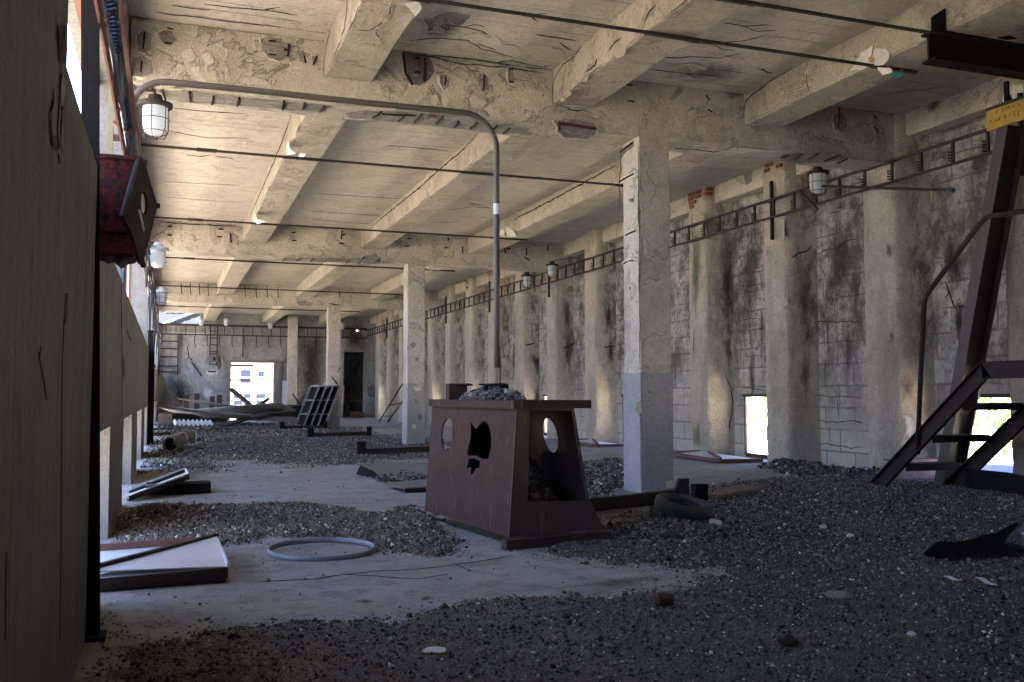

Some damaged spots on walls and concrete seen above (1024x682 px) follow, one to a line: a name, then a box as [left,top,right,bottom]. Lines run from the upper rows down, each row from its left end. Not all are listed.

spalling [130,27,332,113]
spalling [346,51,532,135]
spalling [552,118,598,140]
flaking render [688,187,714,209]